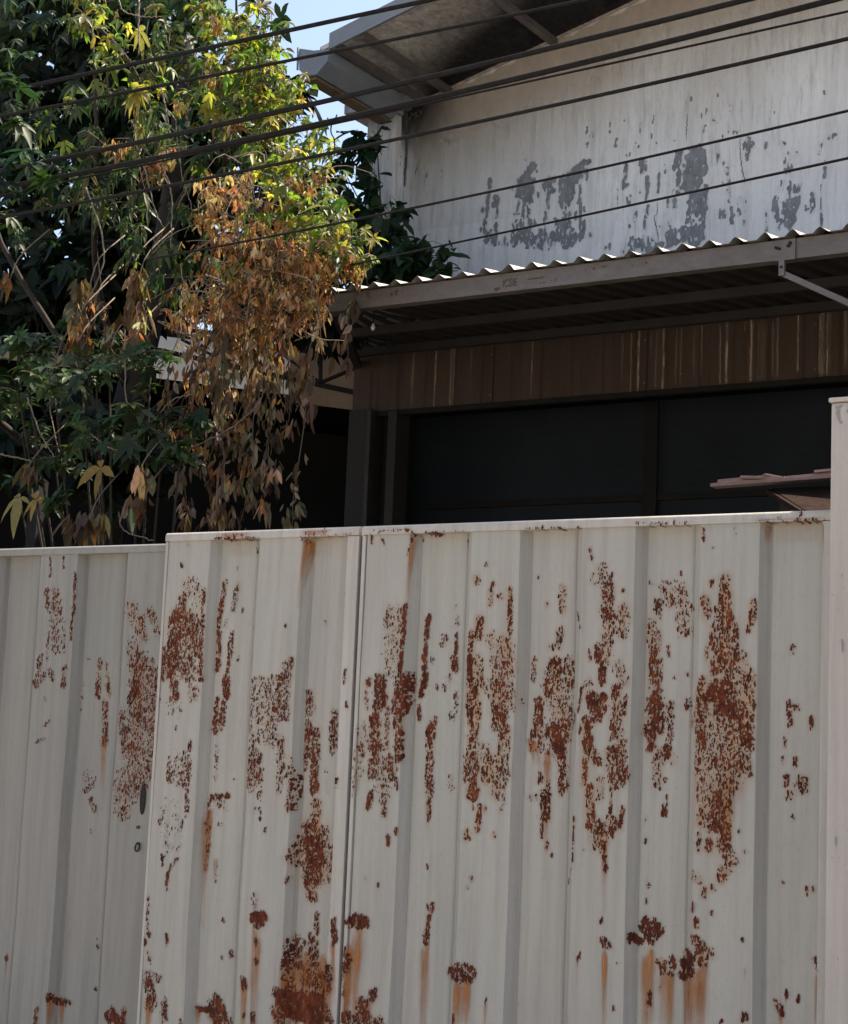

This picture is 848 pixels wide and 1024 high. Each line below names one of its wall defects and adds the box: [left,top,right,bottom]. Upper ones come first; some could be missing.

peeling [480,159,592,251]
peeling [604,143,747,253]
peeling [742,136,768,161]
peeling [765,133,837,232]
corrosion [32,556,77,701]
corrosion [80,562,243,822]
corrosion [351,548,631,884]
corrosion [158,741,192,891]
corrosion [247,657,384,1024]
corrosion [627,571,757,1013]
corrosion [446,962,477,1024]
corrosion [773,989,800,1021]